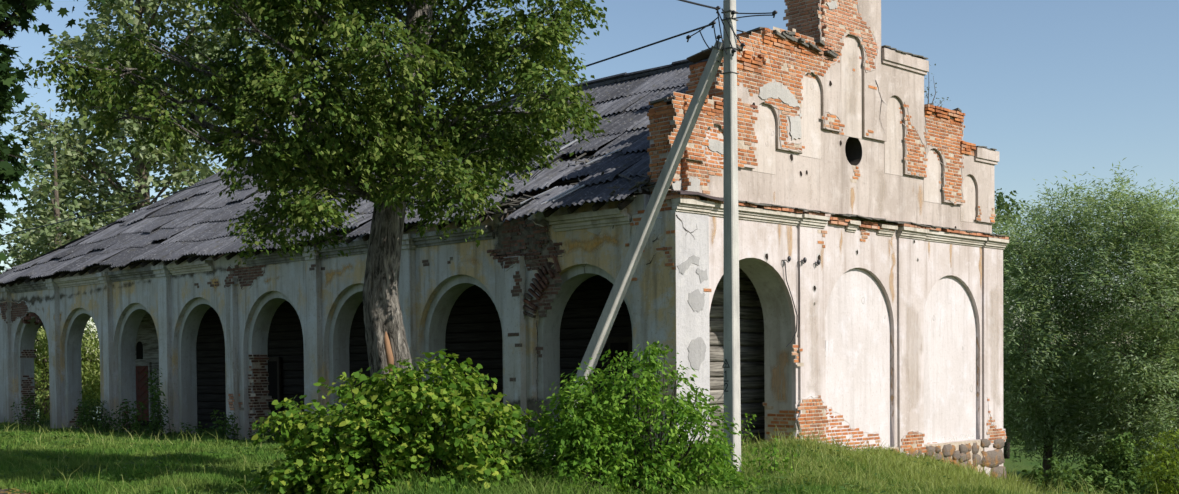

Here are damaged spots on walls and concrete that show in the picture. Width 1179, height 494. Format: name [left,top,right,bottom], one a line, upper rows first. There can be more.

flaking render [736,0,878,178]
flaking render [643,58,723,312]
flaking render [850,165,860,183]
flaking render [899,102,996,223]
flaking render [194,265,268,292]
flaking render [487,216,629,297]
flaking render [816,230,827,263]
flaking render [855,228,870,255]
peeling [688,337,707,370]
flaking render [228,354,273,439]
flaking render [763,395,882,450]
flaking render [900,430,937,454]